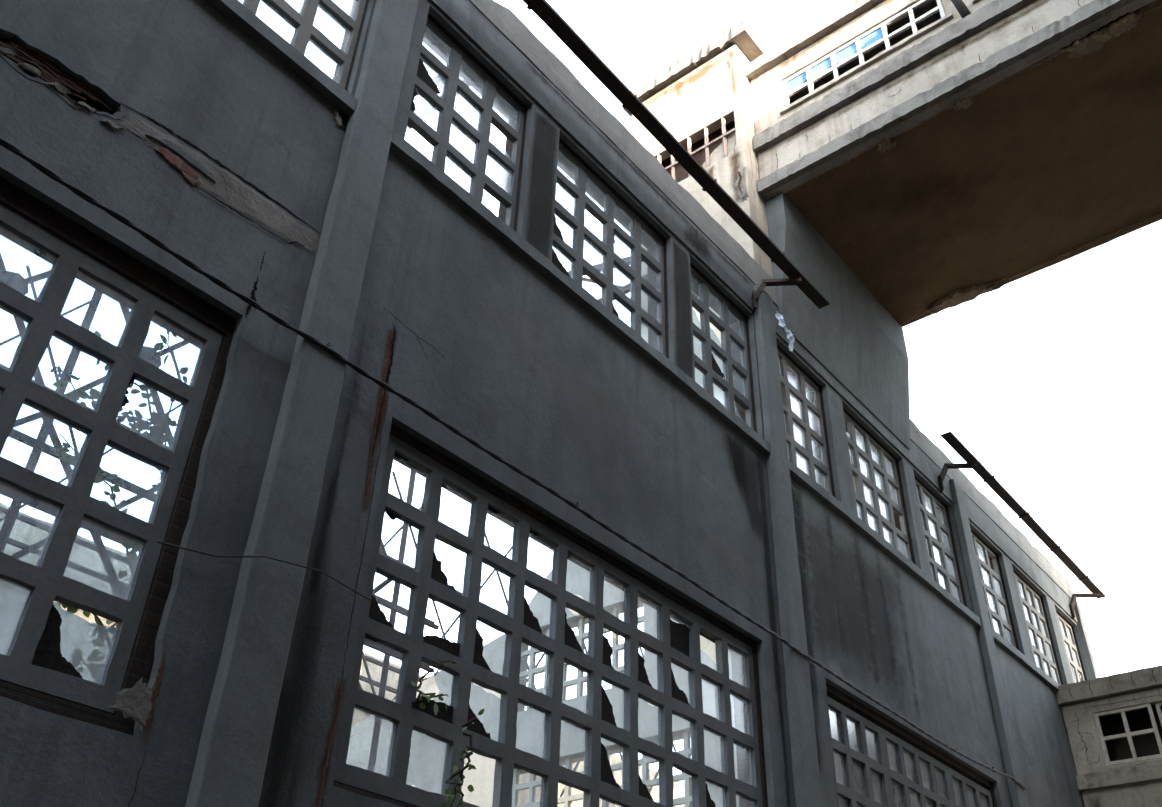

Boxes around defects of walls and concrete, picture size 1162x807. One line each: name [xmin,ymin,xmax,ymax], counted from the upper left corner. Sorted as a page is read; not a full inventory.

flaking render [1018,6,1146,73]
flaking render [913,215,1160,319]
corrosion [363,325,396,509]